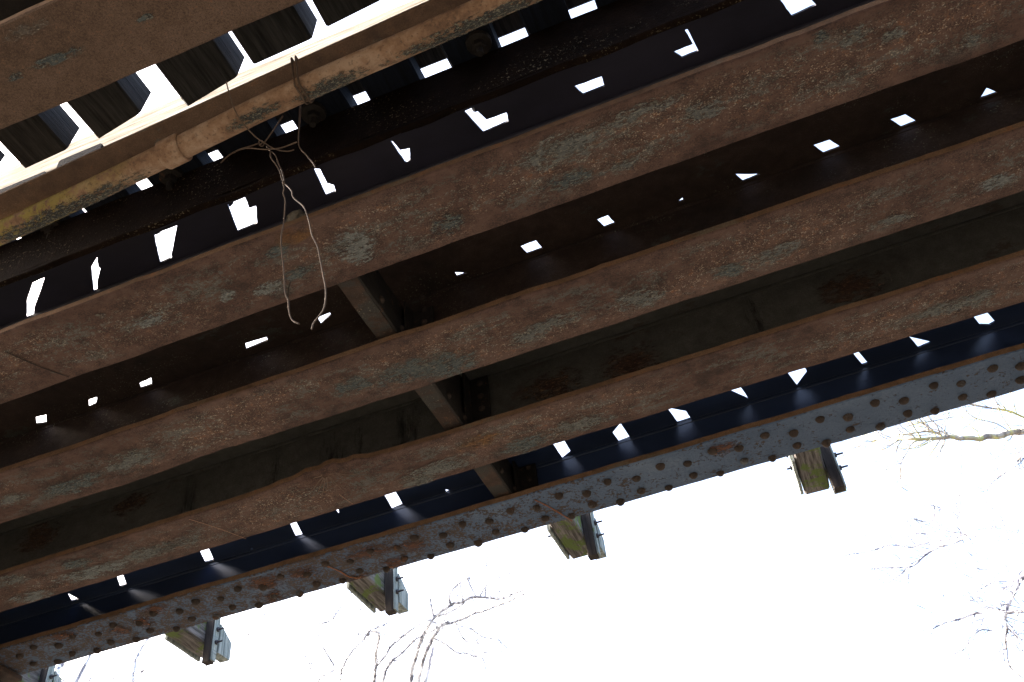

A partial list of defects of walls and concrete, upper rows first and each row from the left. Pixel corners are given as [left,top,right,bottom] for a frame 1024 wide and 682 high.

corrosion [602,346,662,380]
corrosion [345,543,404,569]
corrosion [249,566,319,603]